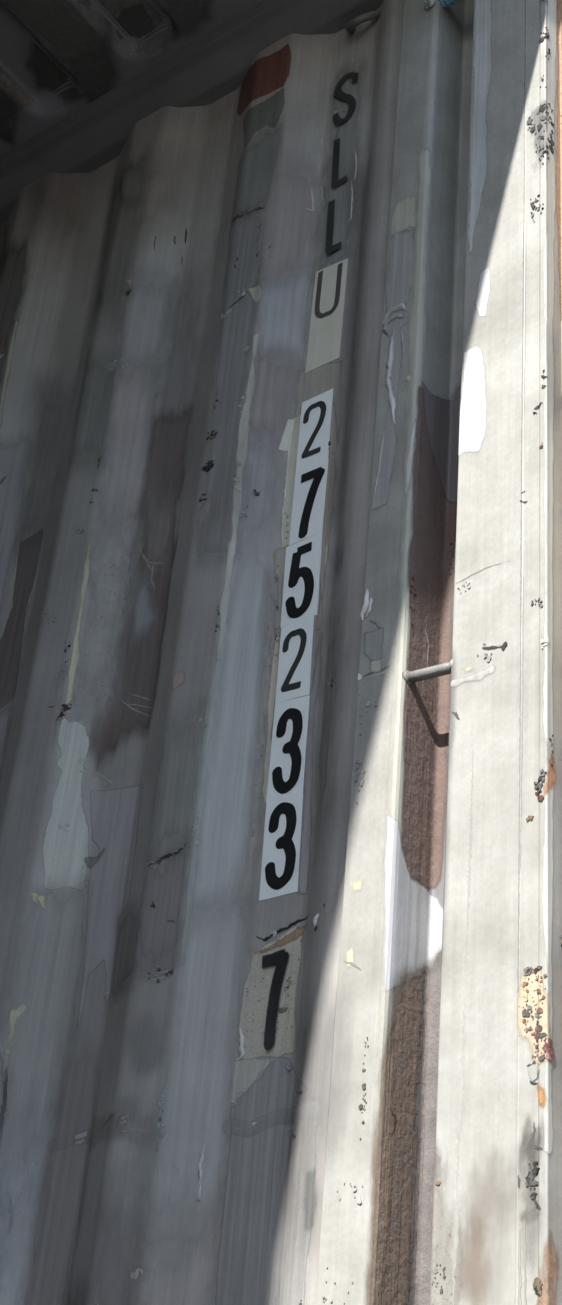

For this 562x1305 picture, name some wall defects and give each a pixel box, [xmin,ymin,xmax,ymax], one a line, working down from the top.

peeling [31,704,89,909]
rust [533,1233,558,1305]